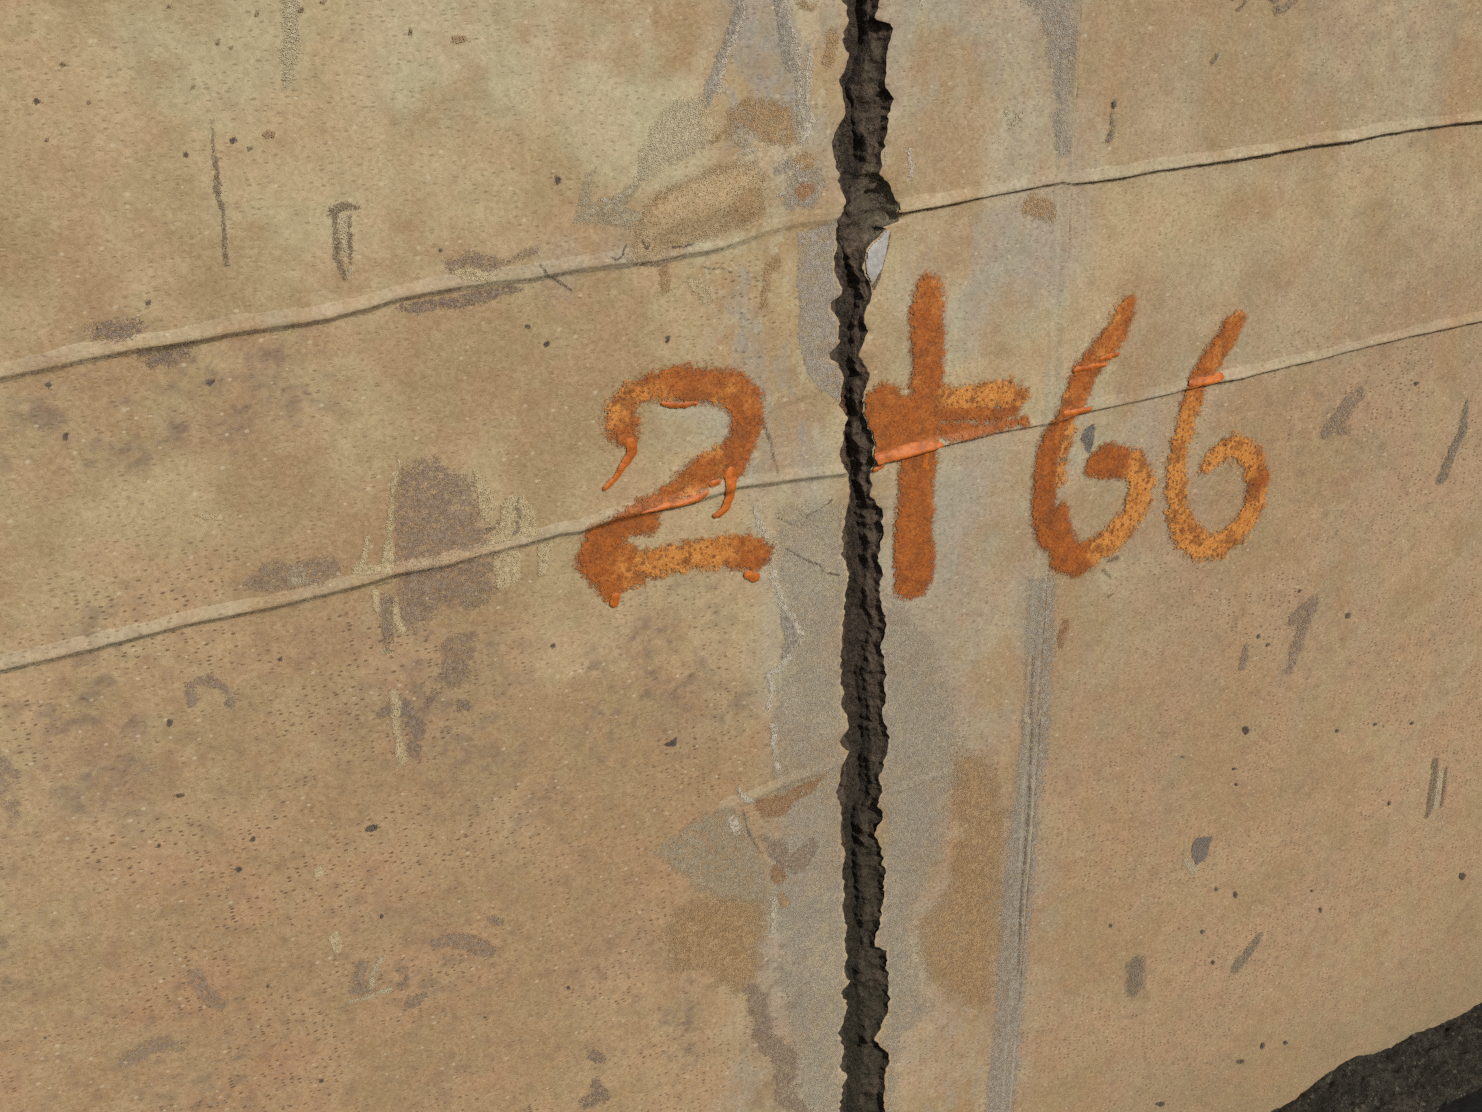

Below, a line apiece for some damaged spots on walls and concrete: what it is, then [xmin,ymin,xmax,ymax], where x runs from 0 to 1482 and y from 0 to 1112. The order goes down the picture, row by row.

crack [693,0,1482,1112]